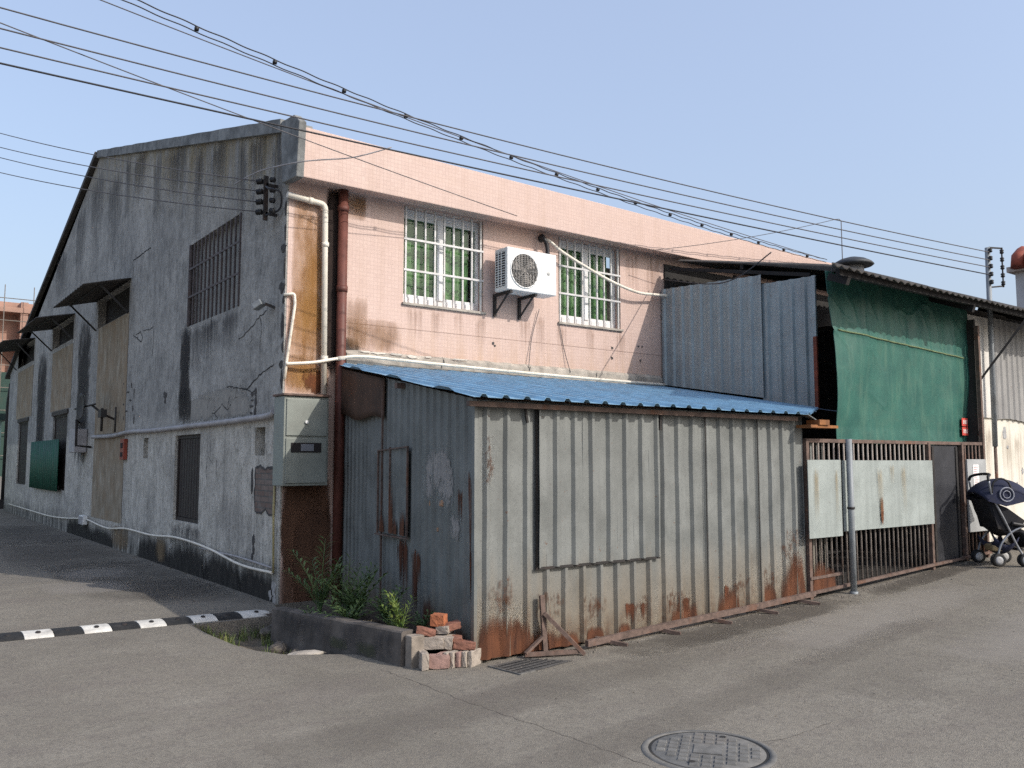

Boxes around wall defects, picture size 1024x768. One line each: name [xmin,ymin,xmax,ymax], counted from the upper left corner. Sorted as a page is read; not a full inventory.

leakage [178,321,215,421]
crack [201,364,274,487]
spalling [251,465,276,516]
leakage [67,520,125,549]
leakage [138,539,273,602]
rust [379,497,435,628]
rust [617,597,646,633]
rust [667,592,697,621]
rust [479,622,604,660]